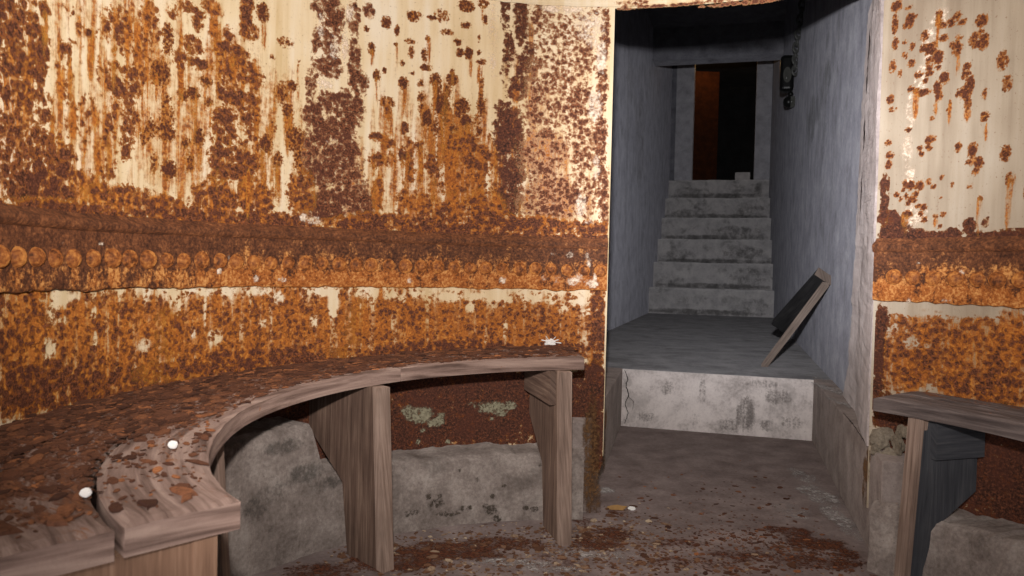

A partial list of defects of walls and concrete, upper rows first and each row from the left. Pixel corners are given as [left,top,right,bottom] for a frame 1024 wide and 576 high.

rust [0,0,776,238]
rust [877,0,1024,239]
rust [0,286,630,551]
rust [872,304,1024,453]
rust [958,433,1024,525]
rust [287,557,376,576]
rust [394,537,577,573]